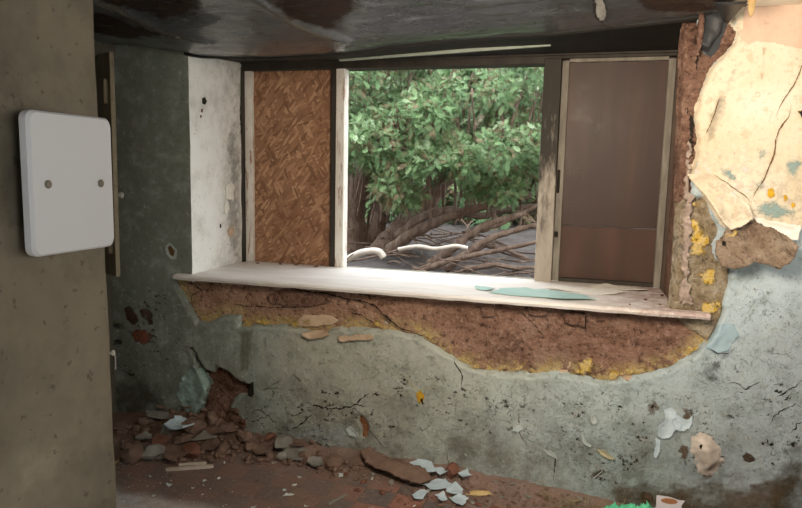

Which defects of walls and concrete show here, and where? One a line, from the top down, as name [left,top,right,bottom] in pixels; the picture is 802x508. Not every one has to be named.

leakage [93,0,203,44]
crack [715,66,802,202]
flaking render [177,0,802,381]
flaking render [176,348,254,429]
peeling [260,375,411,448]
peeling [412,376,533,437]
peeling [559,393,724,487]
leakage [614,479,795,508]